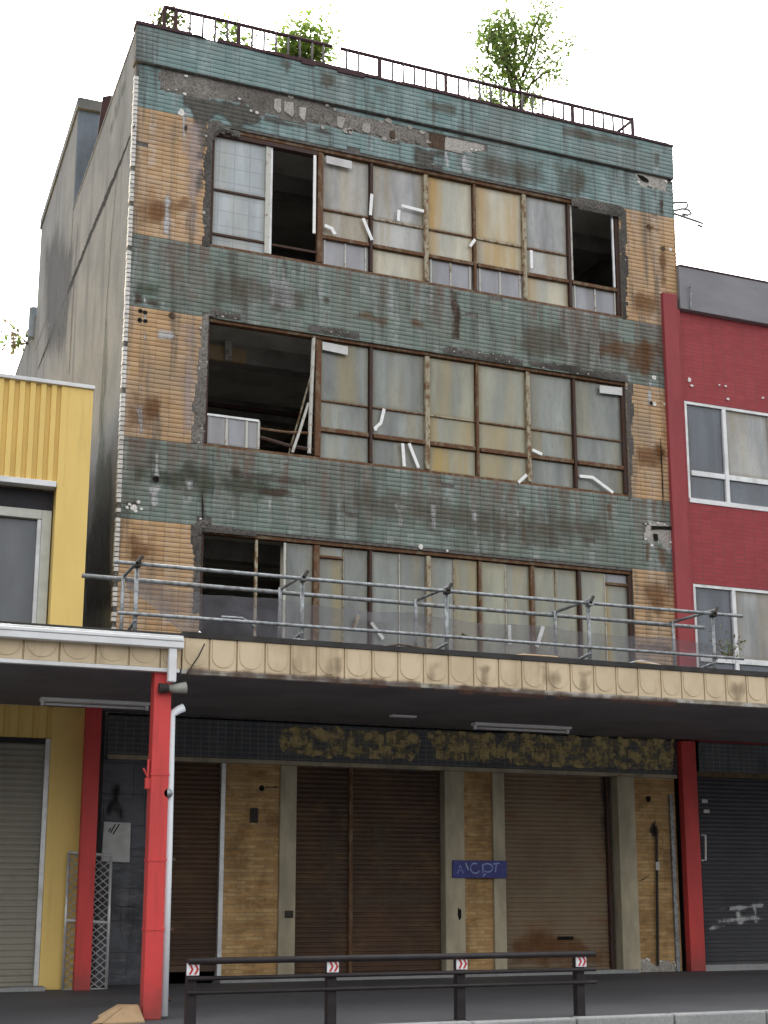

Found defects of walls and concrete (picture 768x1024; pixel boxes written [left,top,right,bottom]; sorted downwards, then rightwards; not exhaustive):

spalling [274,93,484,153]
spalling [634,173,667,191]
leakage [96,344,106,480]
leakage [149,454,160,506]
leakage [86,512,111,614]
spalling [644,522,672,548]